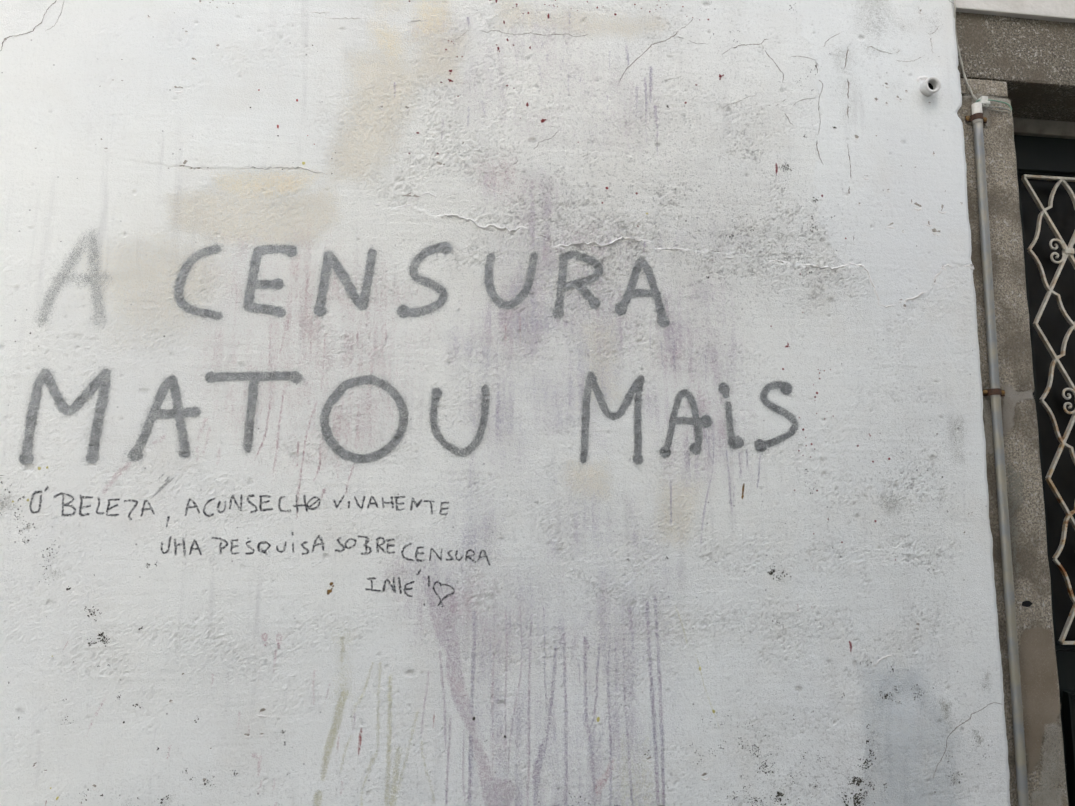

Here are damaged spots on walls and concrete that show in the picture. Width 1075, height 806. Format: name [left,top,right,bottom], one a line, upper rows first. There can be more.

crack [1,1,64,50]
crack [619,19,938,164]